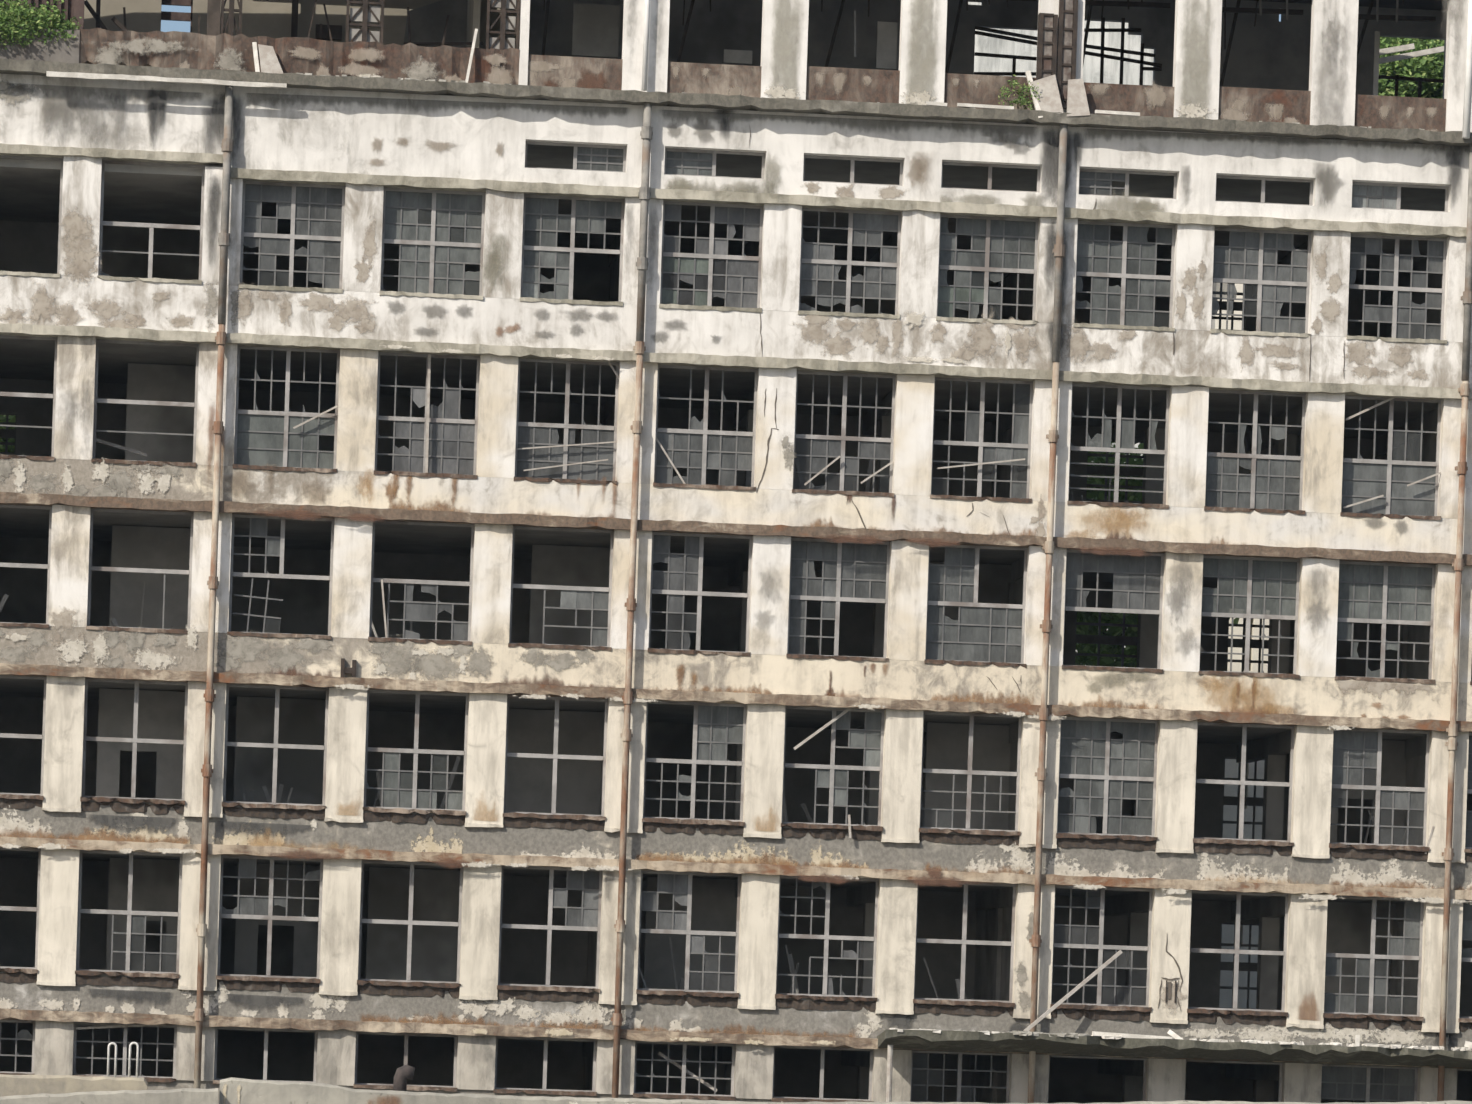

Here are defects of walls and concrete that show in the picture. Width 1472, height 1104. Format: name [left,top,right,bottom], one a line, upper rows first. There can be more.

damp [664,0,1470,206]
peeling [171,283,412,349]
crack [756,388,779,493]
rust [256,475,463,522]
peeling [0,609,198,670]
peeling [325,640,493,690]
rust [503,678,615,688]
rust [665,665,772,694]
rust [932,693,1031,705]
rust [1068,699,1158,709]
peeling [411,827,869,880]
peeling [406,997,643,1036]